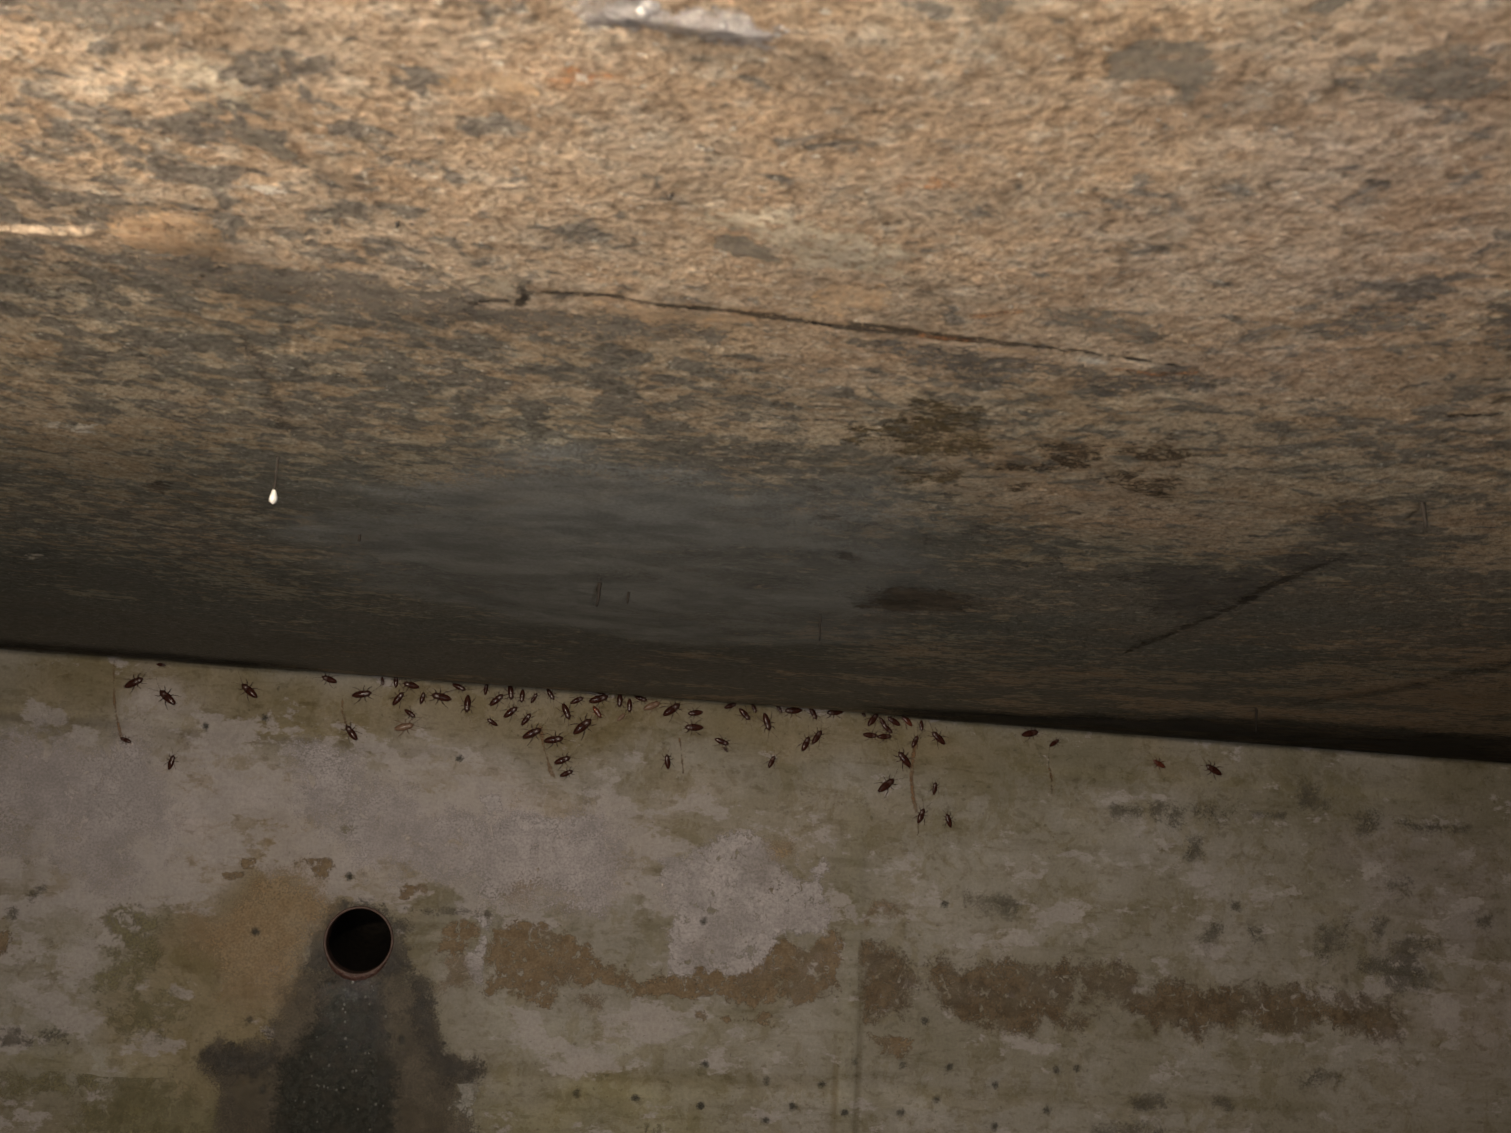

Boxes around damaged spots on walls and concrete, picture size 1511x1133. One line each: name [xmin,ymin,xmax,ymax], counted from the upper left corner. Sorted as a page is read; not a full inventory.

crack [468,286,1200,377]
crack [1123,555,1348,653]
water stain [93,904,173,1041]
water stain [187,852,1440,1133]
water stain [1,1071,184,1133]